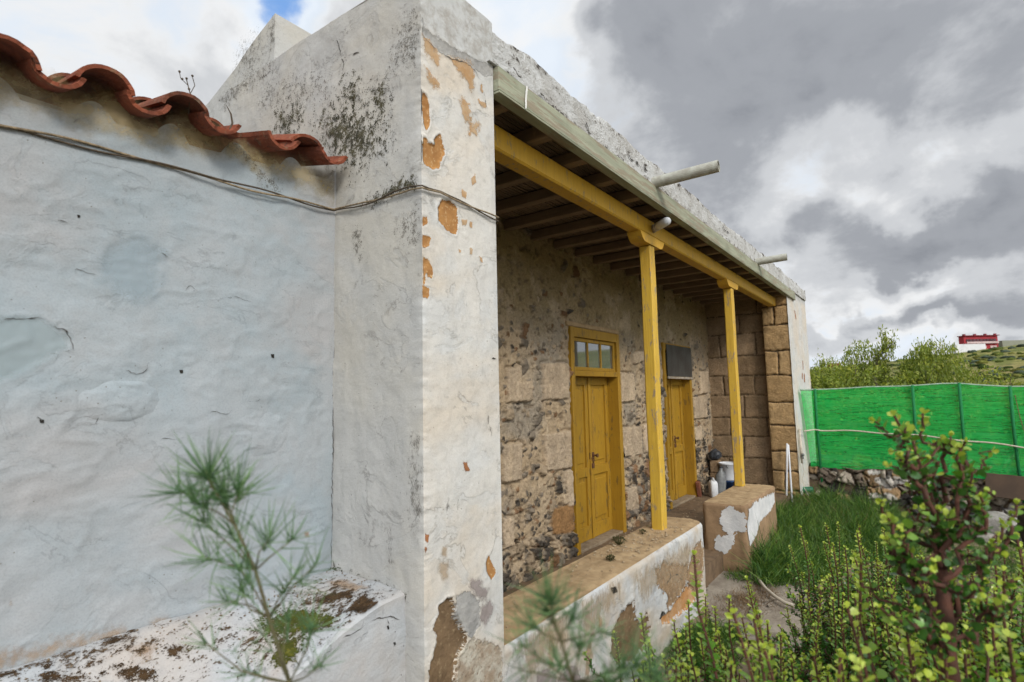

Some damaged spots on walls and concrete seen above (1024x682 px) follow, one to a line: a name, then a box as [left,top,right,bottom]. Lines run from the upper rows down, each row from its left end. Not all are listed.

water stain [0,72,215,149]
water stain [219,3,419,211]
peeling [421,18,493,170]
peeling [422,176,476,298]
spalling [428,591,503,682]
spalling [611,493,775,664]